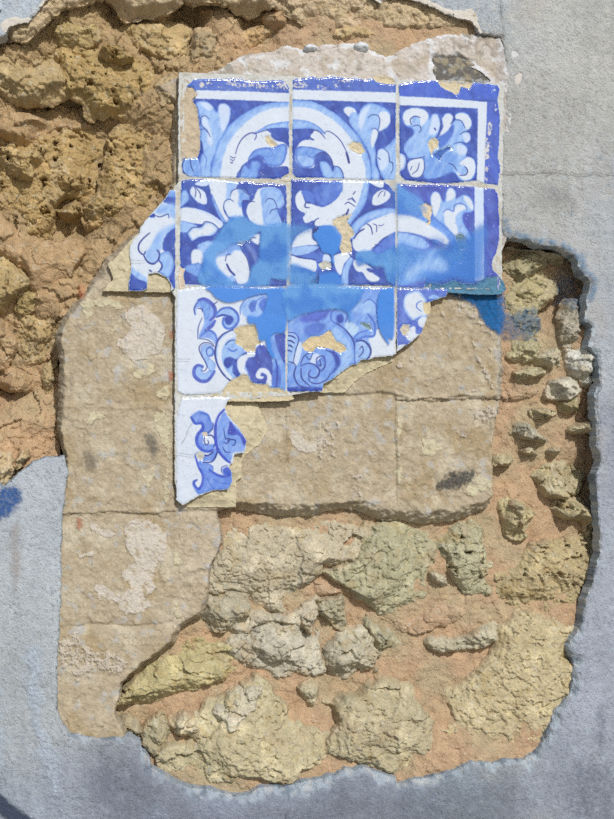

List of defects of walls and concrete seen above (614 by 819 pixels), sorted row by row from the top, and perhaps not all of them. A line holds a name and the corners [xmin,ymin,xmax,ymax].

spalling [0,0,490,486]
spalling [59,241,595,792]